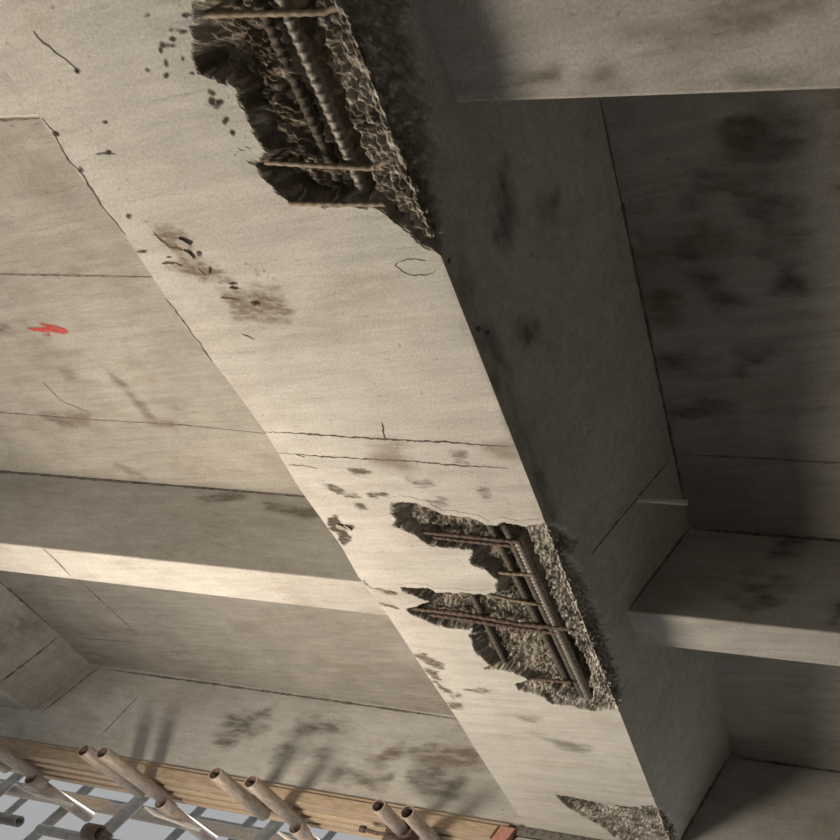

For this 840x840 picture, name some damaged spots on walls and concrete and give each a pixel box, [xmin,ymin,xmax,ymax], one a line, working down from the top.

crack [33,31,77,69]
spalling [158,0,454,265]
crack [267,424,510,469]
spalling [363,493,628,715]
spalling [551,792,682,840]